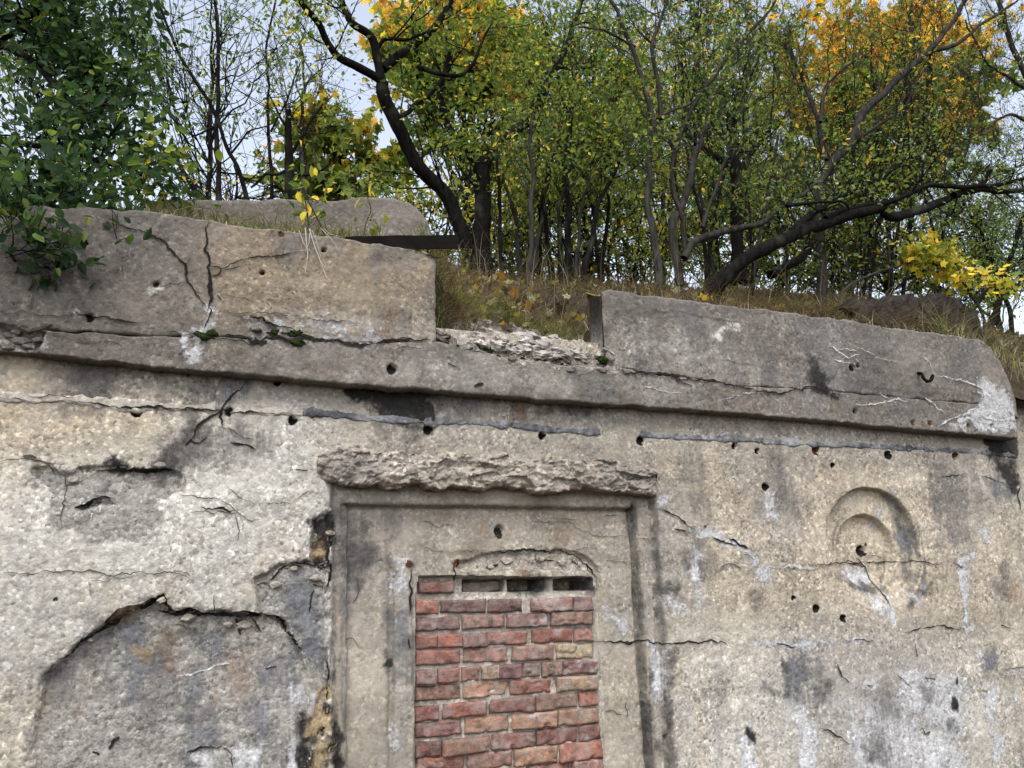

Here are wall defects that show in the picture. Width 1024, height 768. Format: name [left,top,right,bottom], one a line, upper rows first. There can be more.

crack [106,221,431,350]
crack [0,378,301,450]
crack [616,358,838,398]
leakage [796,317,911,417]
leakage [923,343,1020,500]
crack [180,469,312,543]
crack [661,508,754,560]
crack [806,554,962,611]
spalling [23,508,335,768]
leakage [602,605,628,636]
leakage [647,639,678,702]
crack [594,639,732,647]